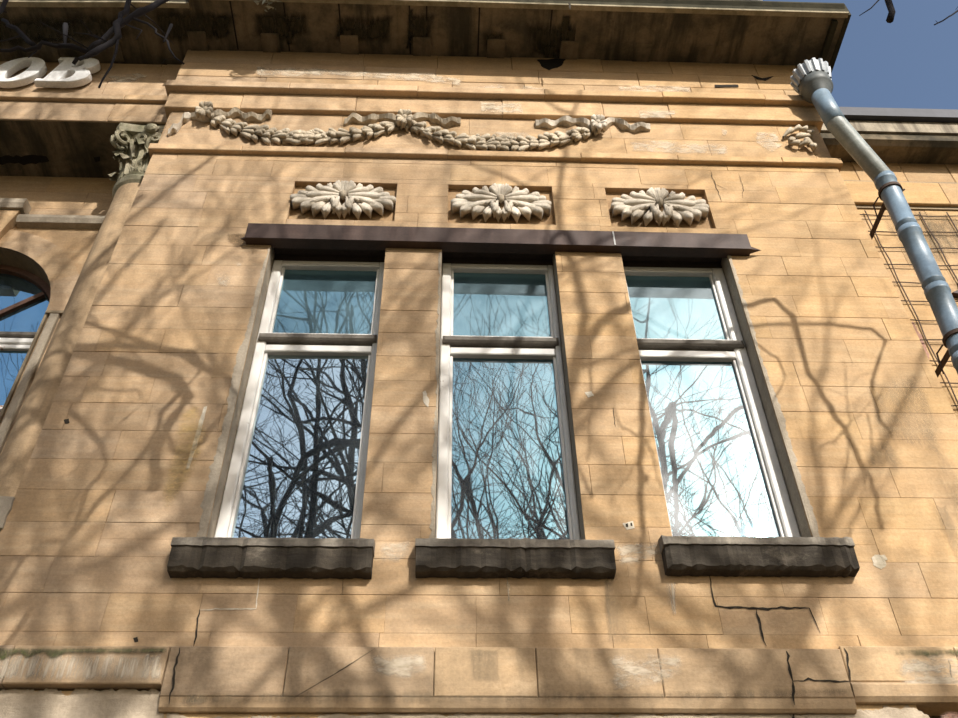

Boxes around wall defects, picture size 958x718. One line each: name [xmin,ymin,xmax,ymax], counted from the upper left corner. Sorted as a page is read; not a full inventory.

crack [169,579,260,703]
crack [295,650,372,697]
crack [709,576,851,718]